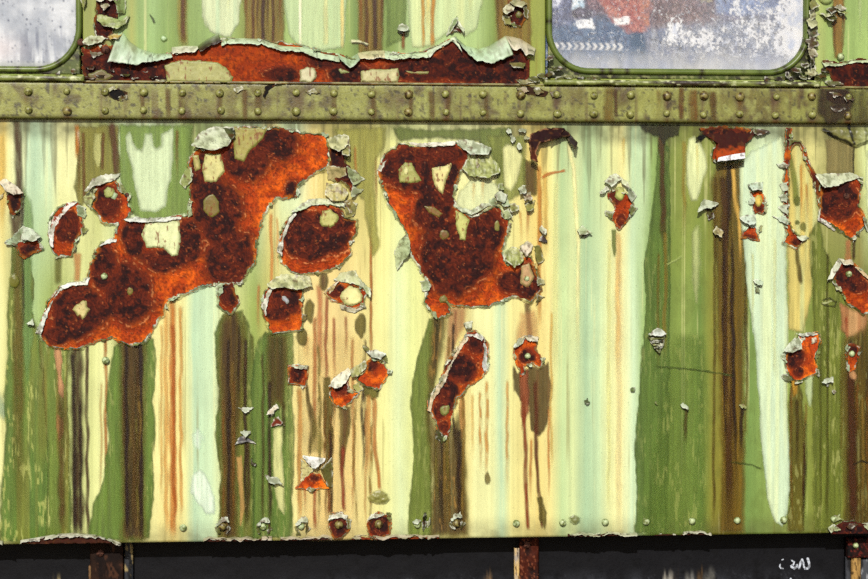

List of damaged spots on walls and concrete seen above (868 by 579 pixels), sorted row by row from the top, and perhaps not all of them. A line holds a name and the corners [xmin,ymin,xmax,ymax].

peeling [71,16,536,82]
peeling [528,55,601,83]
peeling [764,0,868,81]
peeling [489,183,535,219]
corrosion [0,0,564,540]
corrosion [641,88,771,531]